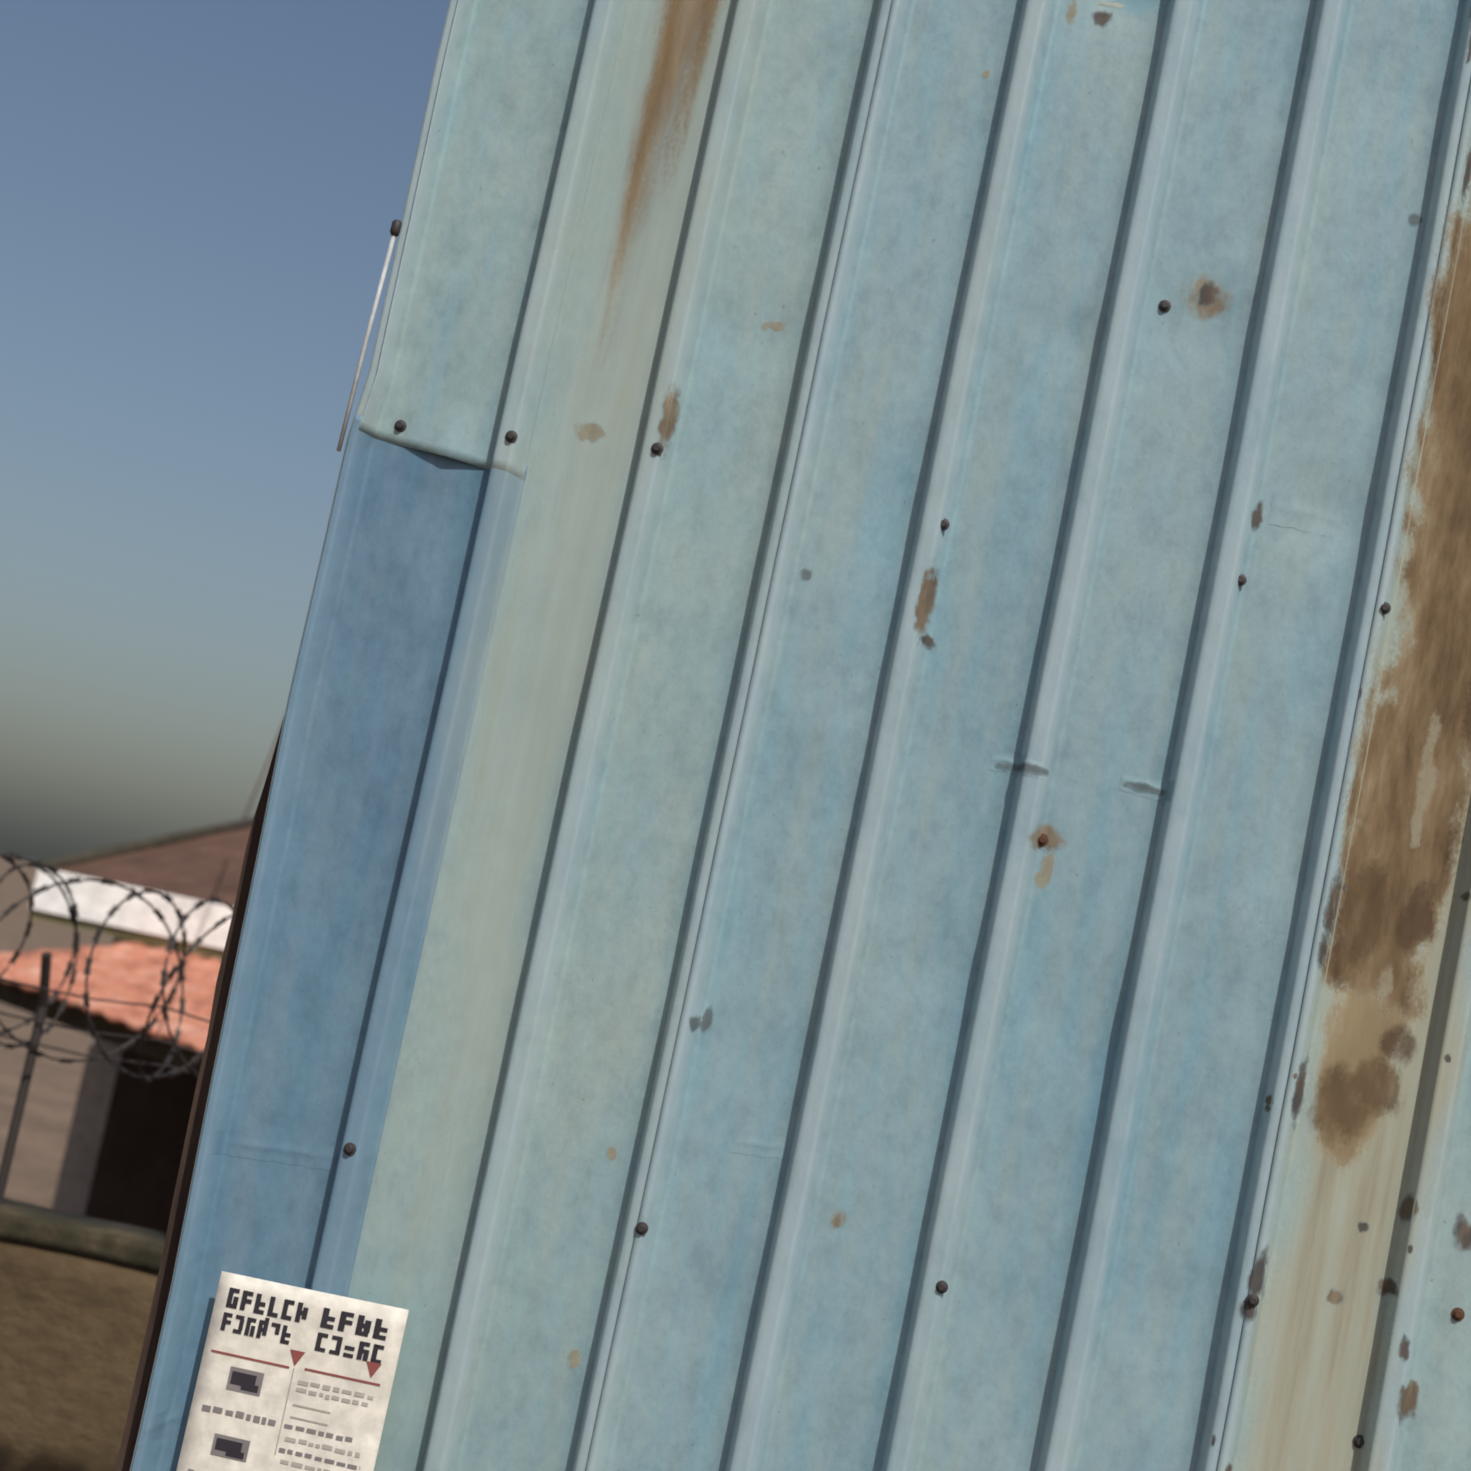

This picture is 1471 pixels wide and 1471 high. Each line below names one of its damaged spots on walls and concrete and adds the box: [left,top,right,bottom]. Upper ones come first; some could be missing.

corrosion [623,0,716,230]
corrosion [1189,276,1227,319]
corrosion [658,392,680,444]
corrosion [915,568,938,649]
corrosion [1292,151,1471,1166]
corrosion [1399,1195,1419,1221]
corrosion [1453,1214,1471,1250]
corrosion [1327,1289,1343,1304]
corrosion [1378,1278,1398,1295]
corrosion [1399,1335,1410,1360]
corrosion [1398,1380,1419,1421]